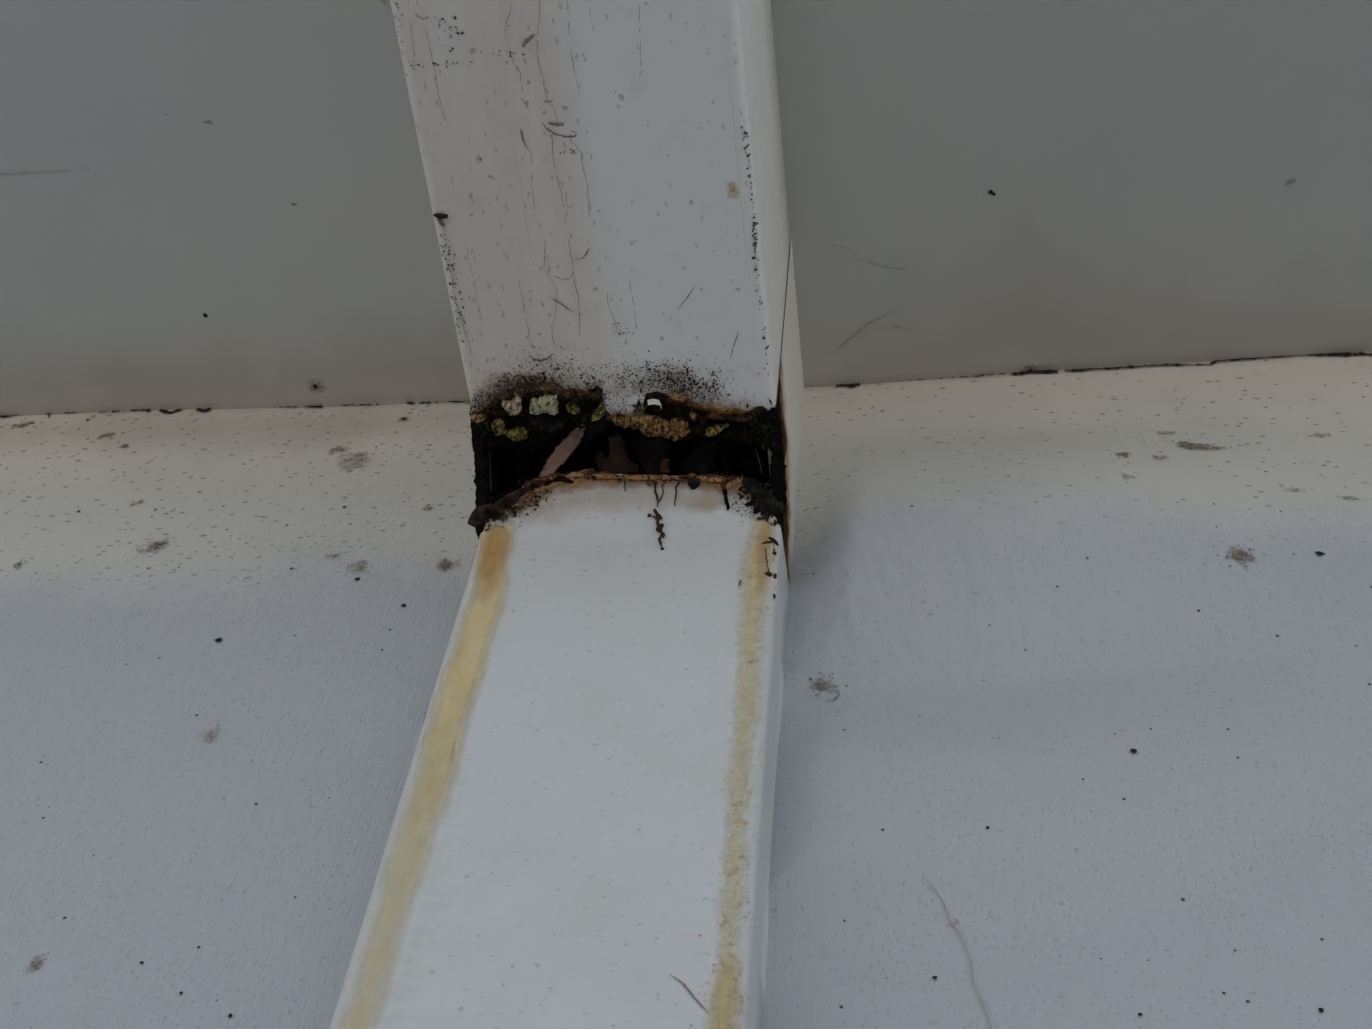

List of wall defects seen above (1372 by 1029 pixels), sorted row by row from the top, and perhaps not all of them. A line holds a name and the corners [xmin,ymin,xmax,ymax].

peeling [471,381,753,441]
damp [465,337,768,432]